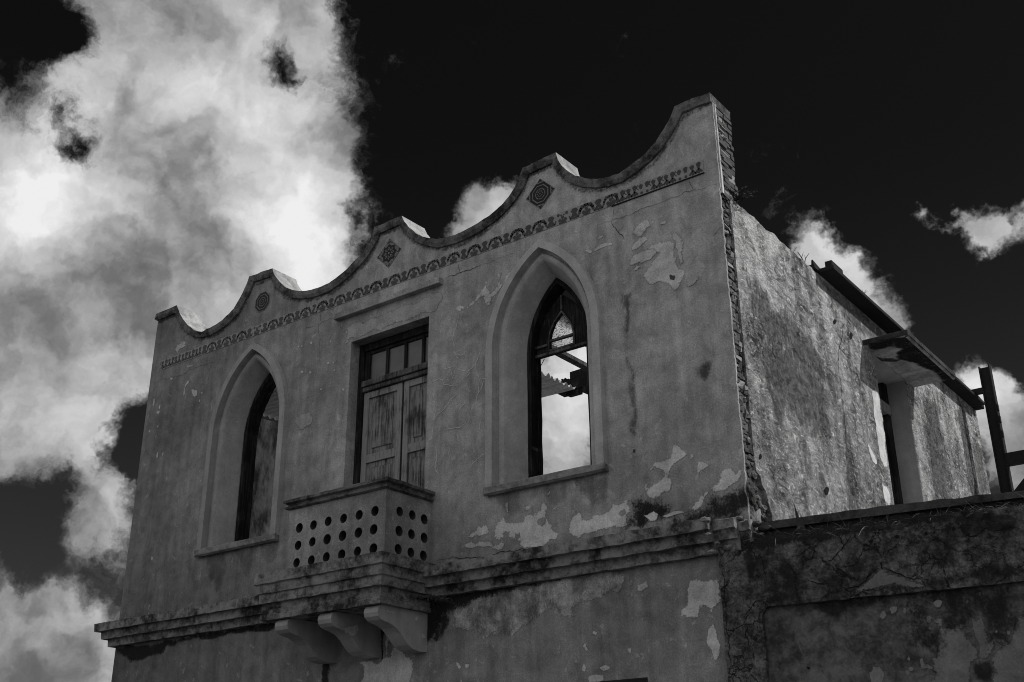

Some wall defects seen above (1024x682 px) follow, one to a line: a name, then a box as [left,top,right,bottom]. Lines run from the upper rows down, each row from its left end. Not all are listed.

peeling [630,219,698,291]
spalling [644,104,767,532]
peeling [464,492,631,551]
damp [427,582,540,641]
peeling [680,579,721,660]
crack [803,527,1011,595]
damp [818,533,1024,652]
damp [974,662,992,681]